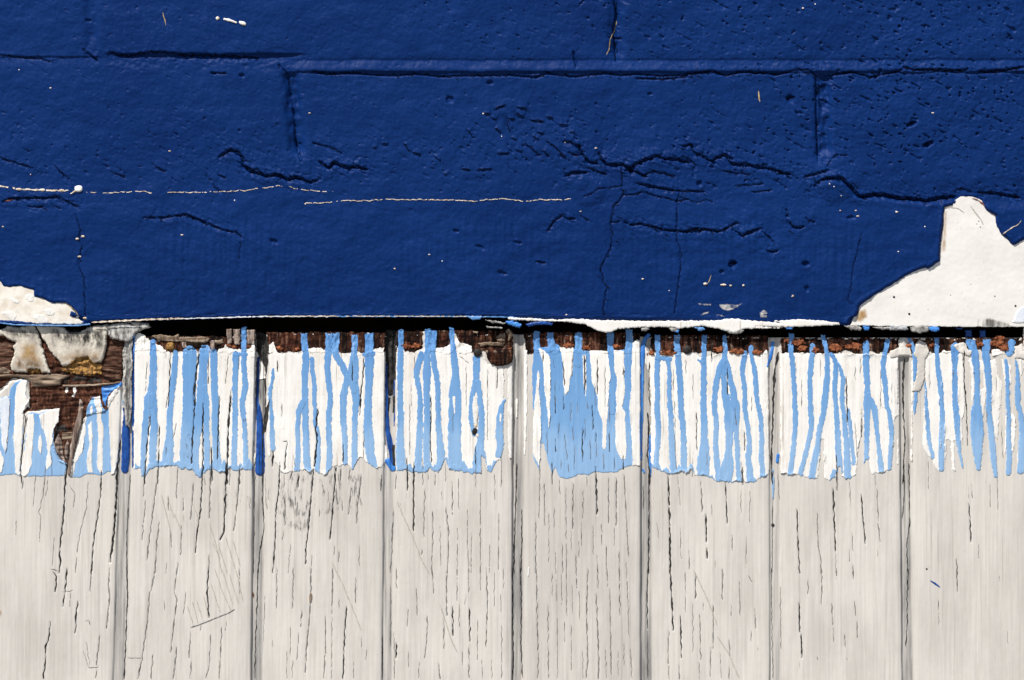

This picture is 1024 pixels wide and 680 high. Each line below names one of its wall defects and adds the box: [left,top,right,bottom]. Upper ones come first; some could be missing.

crack [0,50,1018,320]
crack [6,330,930,679]
peeling [0,196,1024,482]
crack [938,480,998,624]
crack [963,351,1003,455]